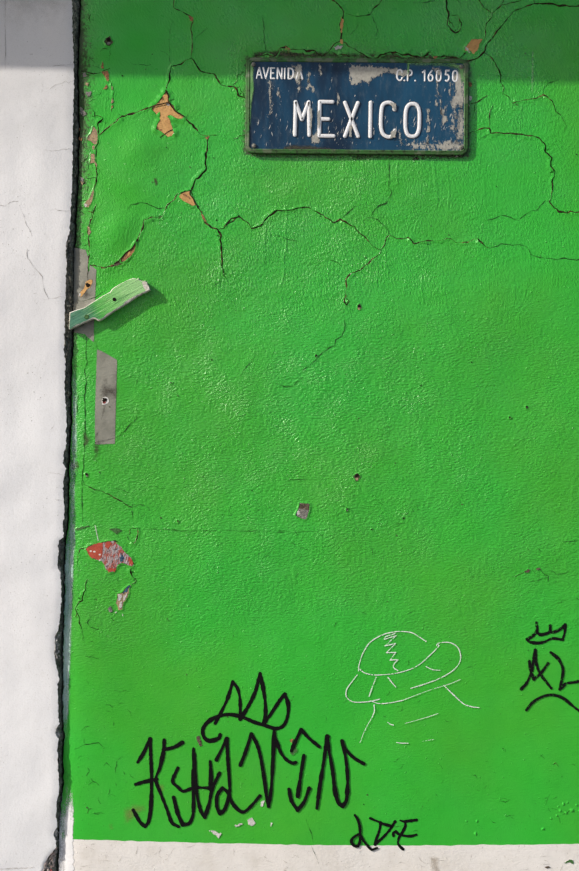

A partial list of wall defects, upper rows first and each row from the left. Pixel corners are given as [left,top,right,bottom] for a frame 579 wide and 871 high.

peeling [462,36,485,56]
peeling [145,87,189,141]
crack [27,47,149,302]
peeling [177,188,207,222]
crack [128,0,579,387]
peeling [113,239,139,266]
spalling [43,0,117,871]
spalling [293,501,312,521]
peeling [82,527,136,575]
peeling [108,583,133,616]